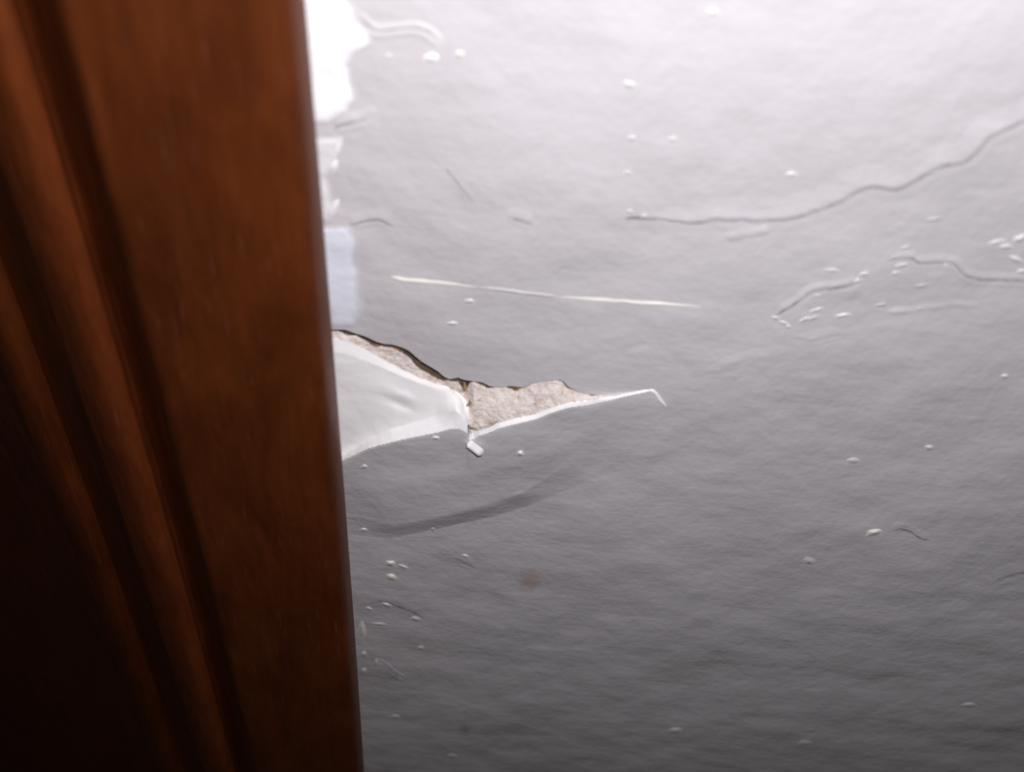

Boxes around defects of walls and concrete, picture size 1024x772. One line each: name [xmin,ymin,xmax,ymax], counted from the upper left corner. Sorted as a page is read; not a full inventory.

flaking render [332,330,667,460]